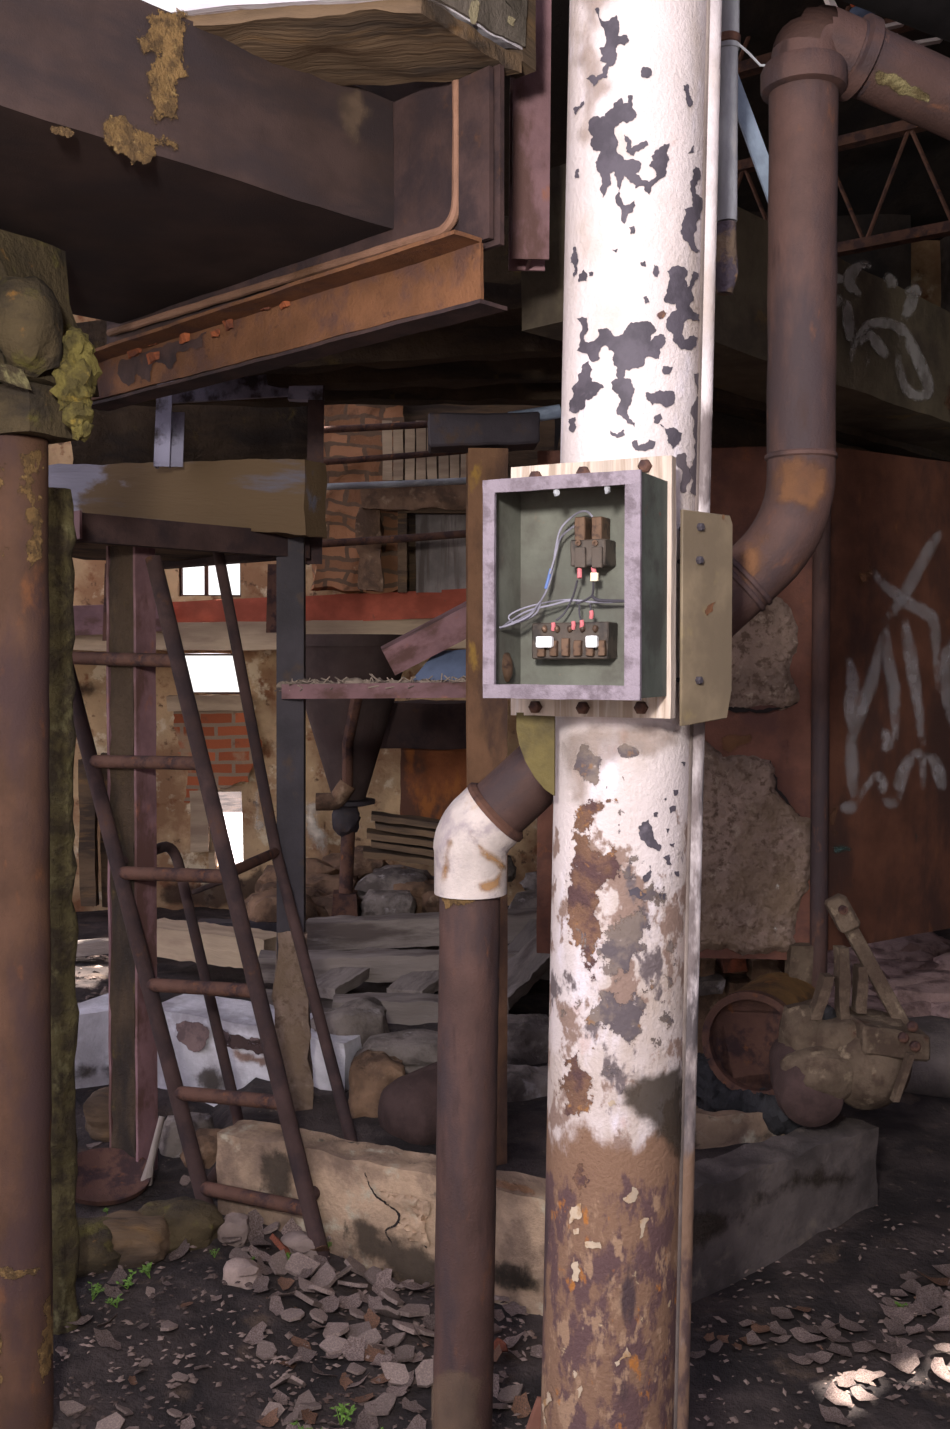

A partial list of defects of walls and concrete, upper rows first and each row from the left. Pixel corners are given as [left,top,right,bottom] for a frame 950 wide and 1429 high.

peeling [586,7,629,86]
peeling [573,95,670,234]
peeling [680,145,703,253]
rust [117,331,207,386]
peeling [568,261,699,495]
spalling [729,596,800,711]
rust [441,846,505,909]
rust [565,798,621,981]
spalling [700,740,811,956]
rust [556,1051,594,1116]
crack [365,1174,427,1248]
rust [569,1138,590,1197]